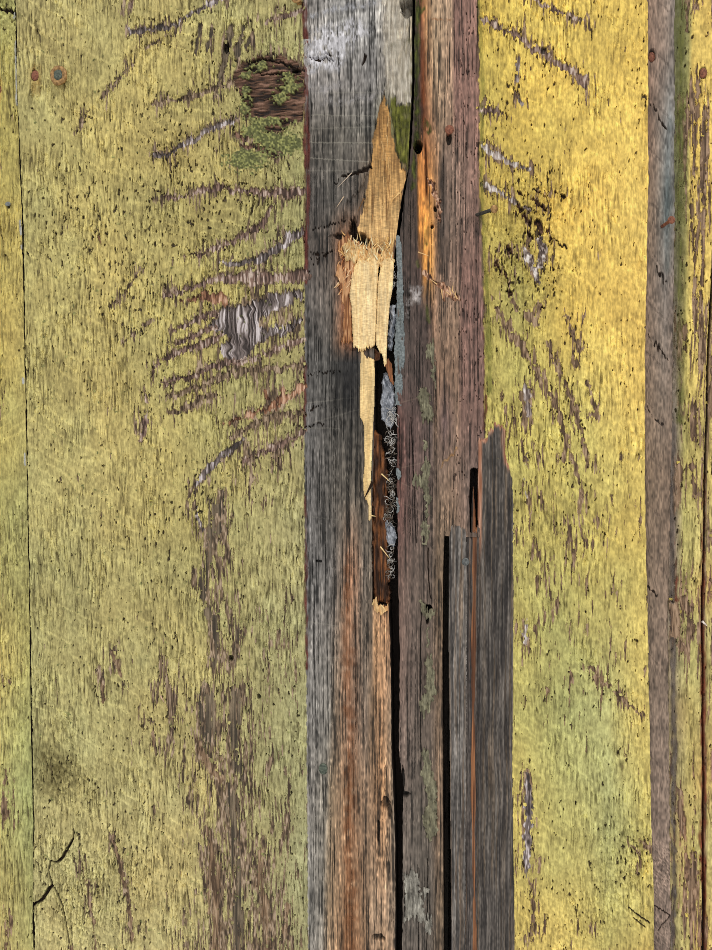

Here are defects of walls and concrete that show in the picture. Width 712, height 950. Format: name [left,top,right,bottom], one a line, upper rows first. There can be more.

peeling [128,0,218,56]
peeling [152,22,251,107]
peeling [480,17,588,89]
peeling [151,120,278,158]
peeling [684,80,709,241]
peeling [164,184,306,258]
peeling [481,182,545,226]
peeling [506,236,547,284]
peeling [151,228,311,414]
peeling [681,253,712,385]
peeling [196,687,244,950]
crack [36,884,54,903]